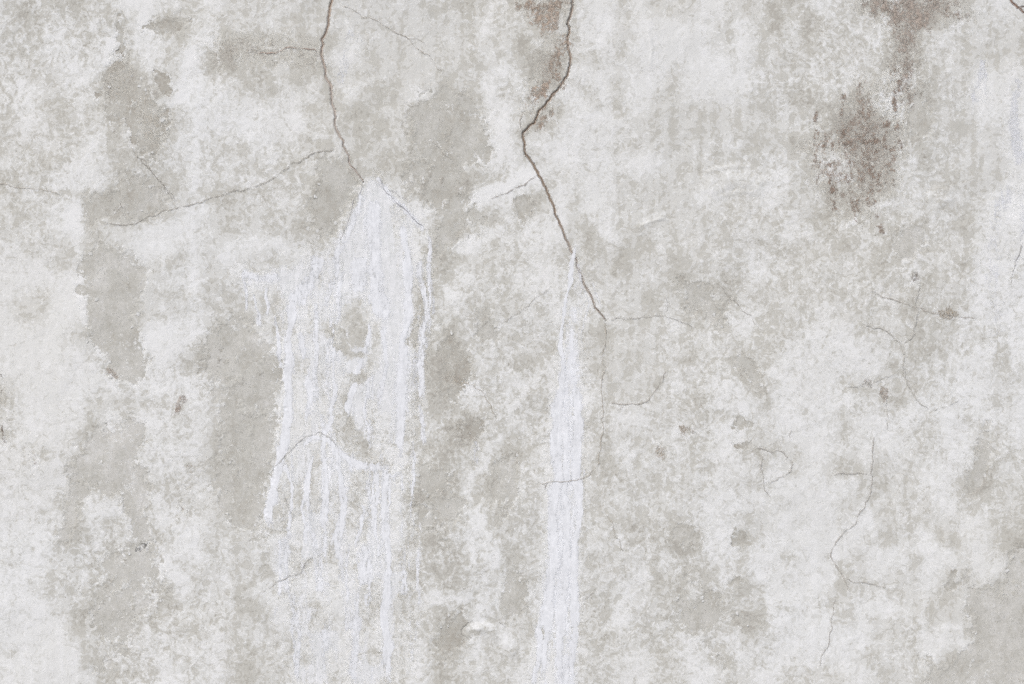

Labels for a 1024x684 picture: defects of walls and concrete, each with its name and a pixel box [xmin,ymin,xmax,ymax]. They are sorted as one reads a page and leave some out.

crack [106,0,440,241]
damp [241,176,435,684]
damp [530,245,601,684]
crack [490,0,691,488]
crack [820,414,888,664]
rust [811,0,971,234]